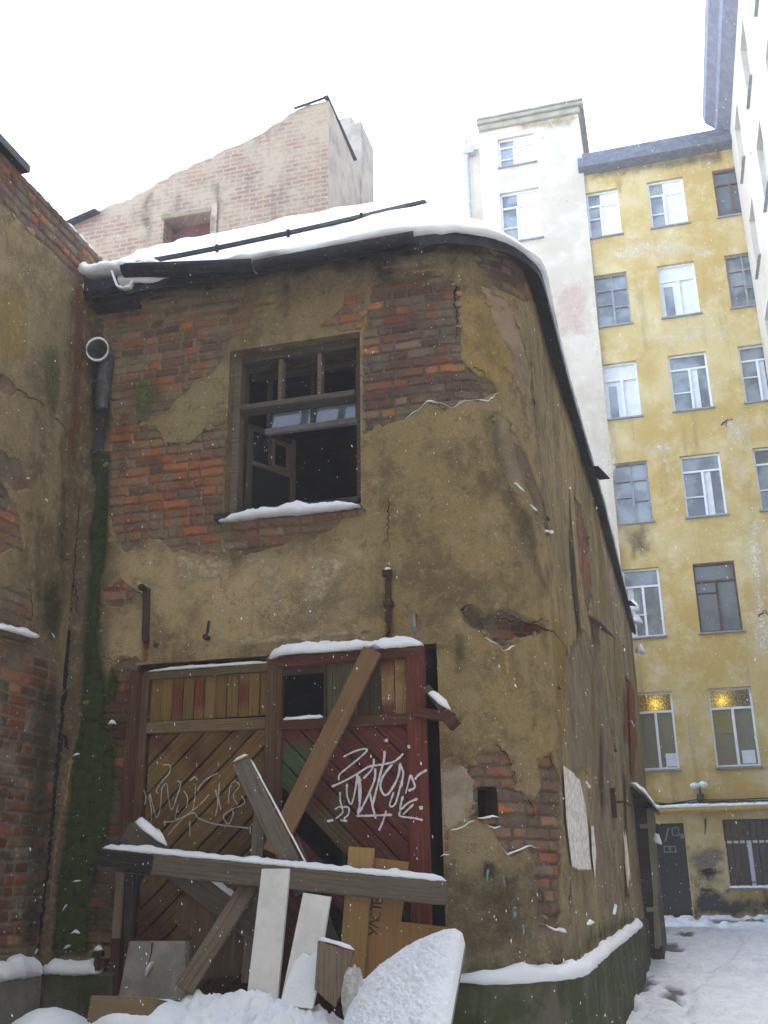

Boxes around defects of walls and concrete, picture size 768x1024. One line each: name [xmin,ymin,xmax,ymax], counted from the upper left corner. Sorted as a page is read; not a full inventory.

flaking render [101,289,367,558]
flaking render [320,270,497,434]
crack [451,285,459,340]
flaking render [0,642,78,957]
crack [17,389,84,956]
flaking render [87,869,116,951]
flaking render [104,657,145,847]
flaking render [461,607,539,651]
flaking render [442,743,565,928]